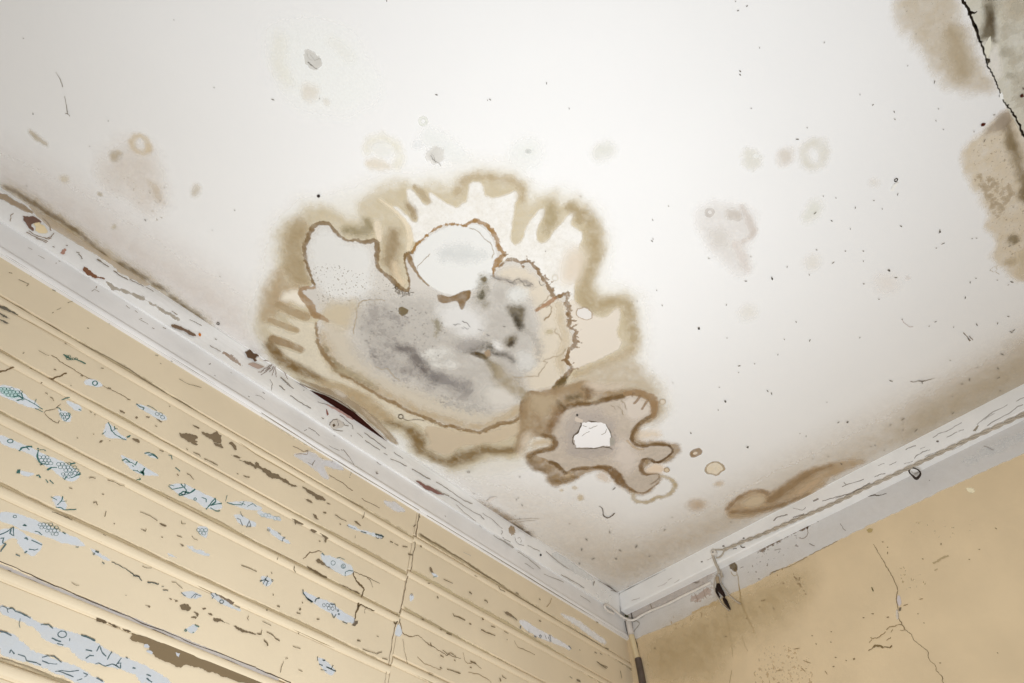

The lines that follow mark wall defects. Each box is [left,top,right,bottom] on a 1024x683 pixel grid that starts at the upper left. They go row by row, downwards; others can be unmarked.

crack [961,0,1024,137]
water stain [894,0,1024,281]
water stain [251,116,725,504]
peeling [0,385,42,412]
peeling [0,435,81,510]
peeling [99,419,360,594]
spalling [572,417,615,450]
water stain [725,459,864,519]
peeling [0,512,291,683]
peeling [302,590,354,624]
peeling [505,612,571,650]
crack [873,544,944,683]